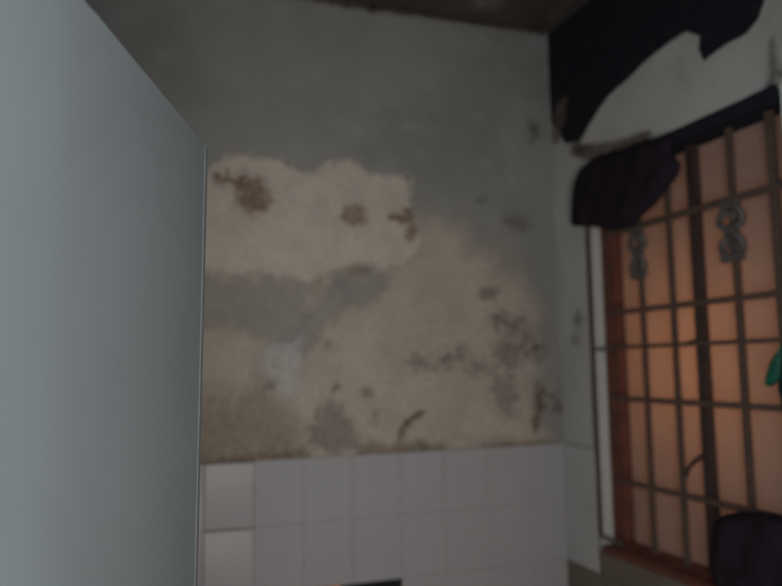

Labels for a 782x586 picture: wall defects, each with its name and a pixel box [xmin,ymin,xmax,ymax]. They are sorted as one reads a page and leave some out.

peeling [548,0,764,144]
peeling [201,151,548,463]